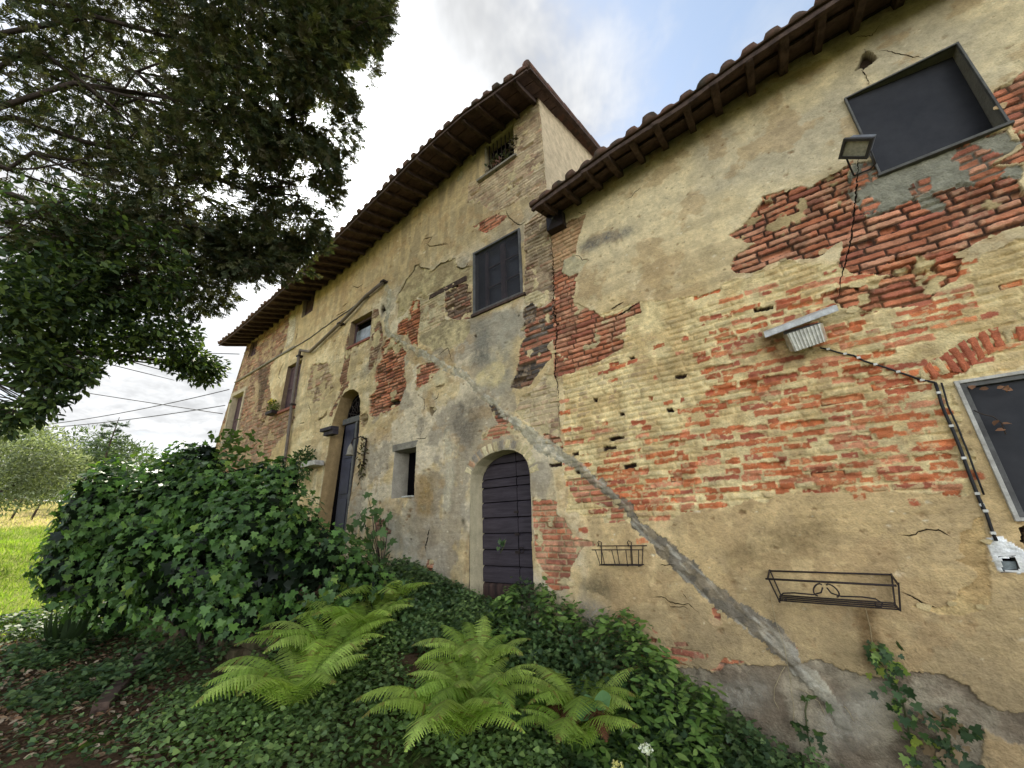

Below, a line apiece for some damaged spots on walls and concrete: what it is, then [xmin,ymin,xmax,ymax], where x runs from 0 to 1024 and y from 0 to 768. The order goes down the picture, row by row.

crack [854,24,924,85]
flaking render [360,258,477,427]
crack [399,236,468,293]
flaking render [467,72,1024,523]
crack [835,159,859,305]
flaking render [532,499,595,591]
crack [899,526,950,536]
crack [901,591,937,608]